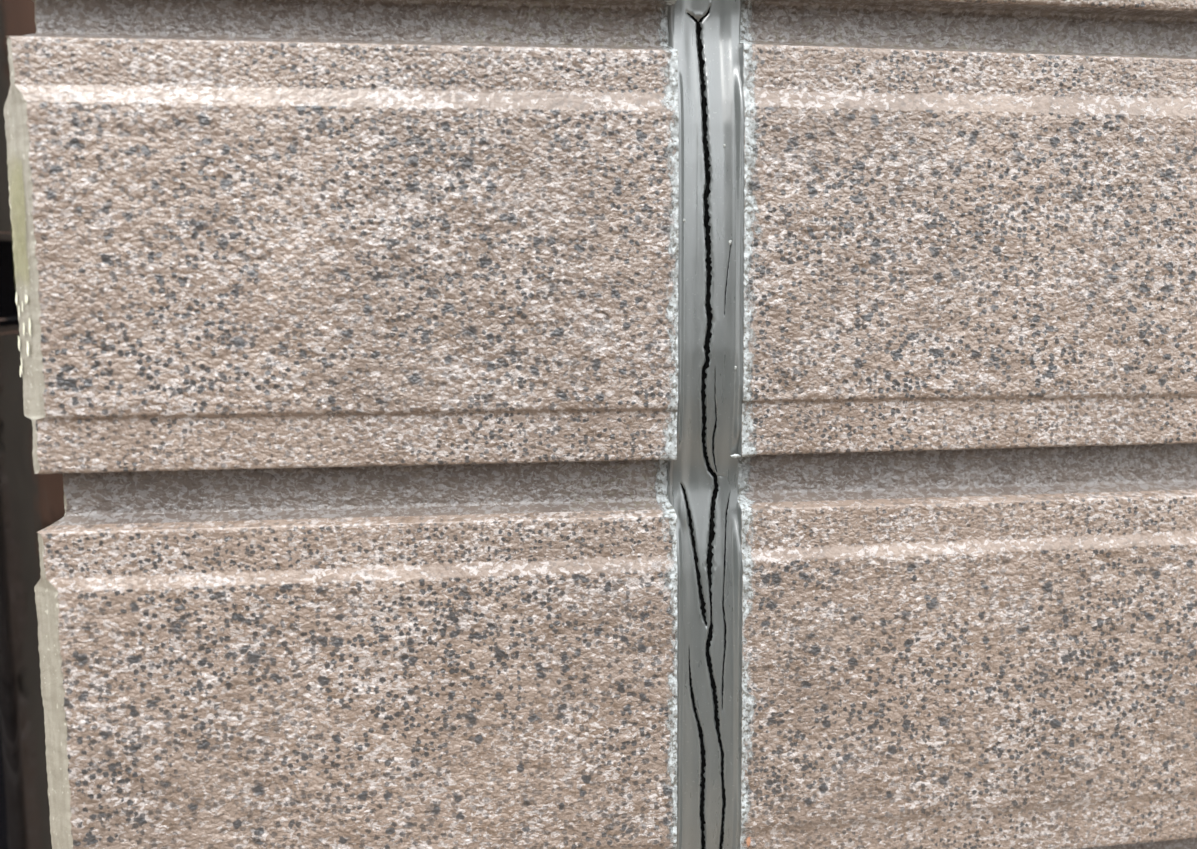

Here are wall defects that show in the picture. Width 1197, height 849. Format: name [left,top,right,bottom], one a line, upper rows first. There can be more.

crack [680,8,731,849]